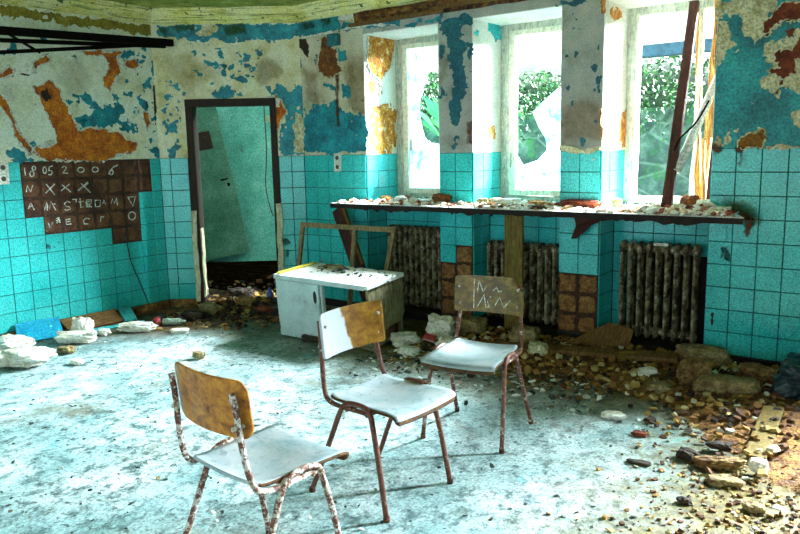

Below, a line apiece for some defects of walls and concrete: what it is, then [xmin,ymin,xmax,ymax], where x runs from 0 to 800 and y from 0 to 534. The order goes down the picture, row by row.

peeling [0,48,186,244]
peeling [0,0,527,156]
peeling [710,0,800,99]
flaking render [714,127,799,151]
flaking render [791,110,800,128]